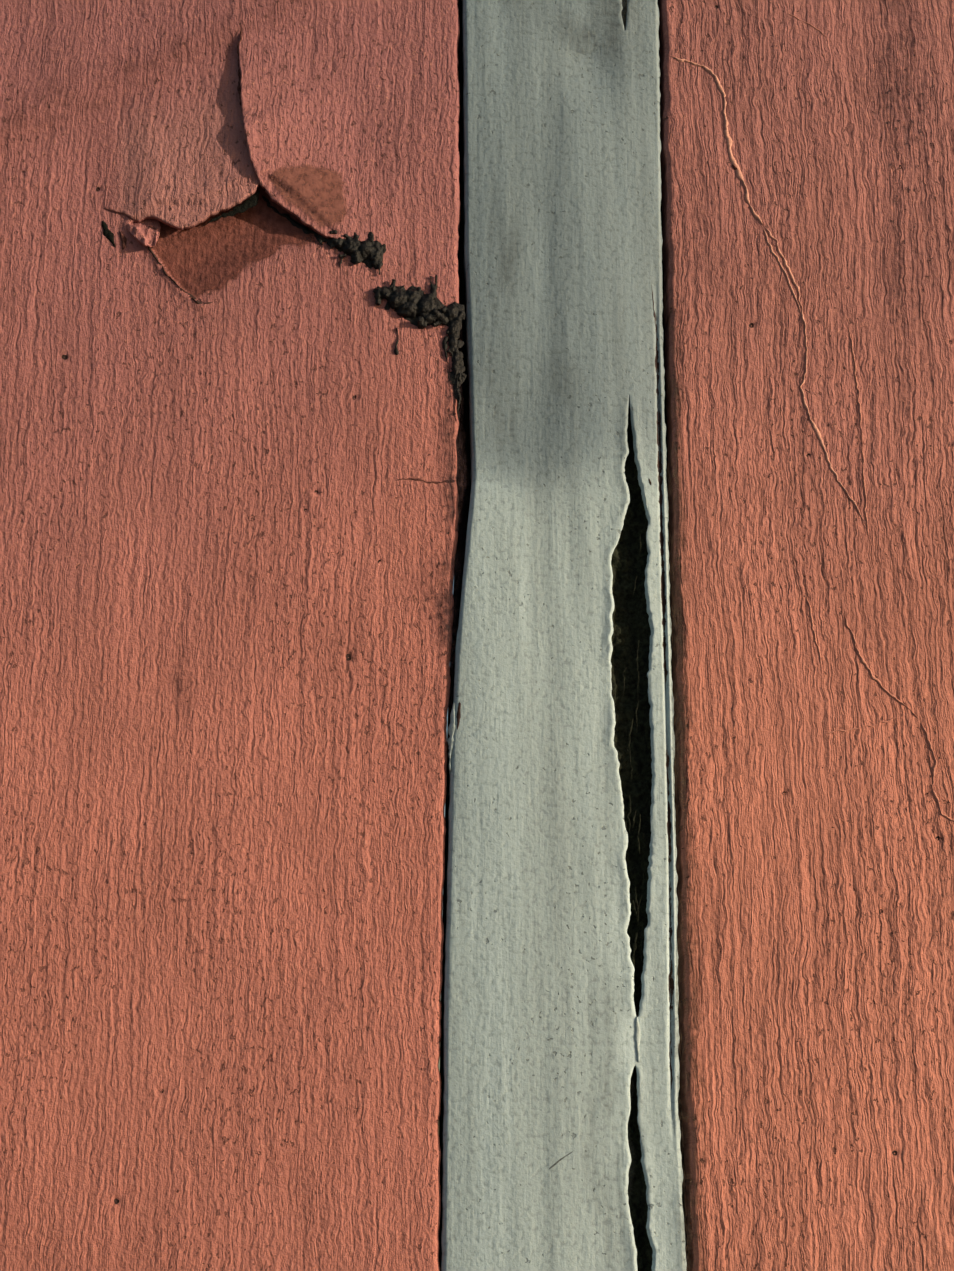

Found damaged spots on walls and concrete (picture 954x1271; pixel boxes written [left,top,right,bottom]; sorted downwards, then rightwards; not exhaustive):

peeling [102,27,403,304]
crack [669,55,870,543]
crack [651,283,668,693]
crack [825,613,954,821]
crack [666,750,674,1089]